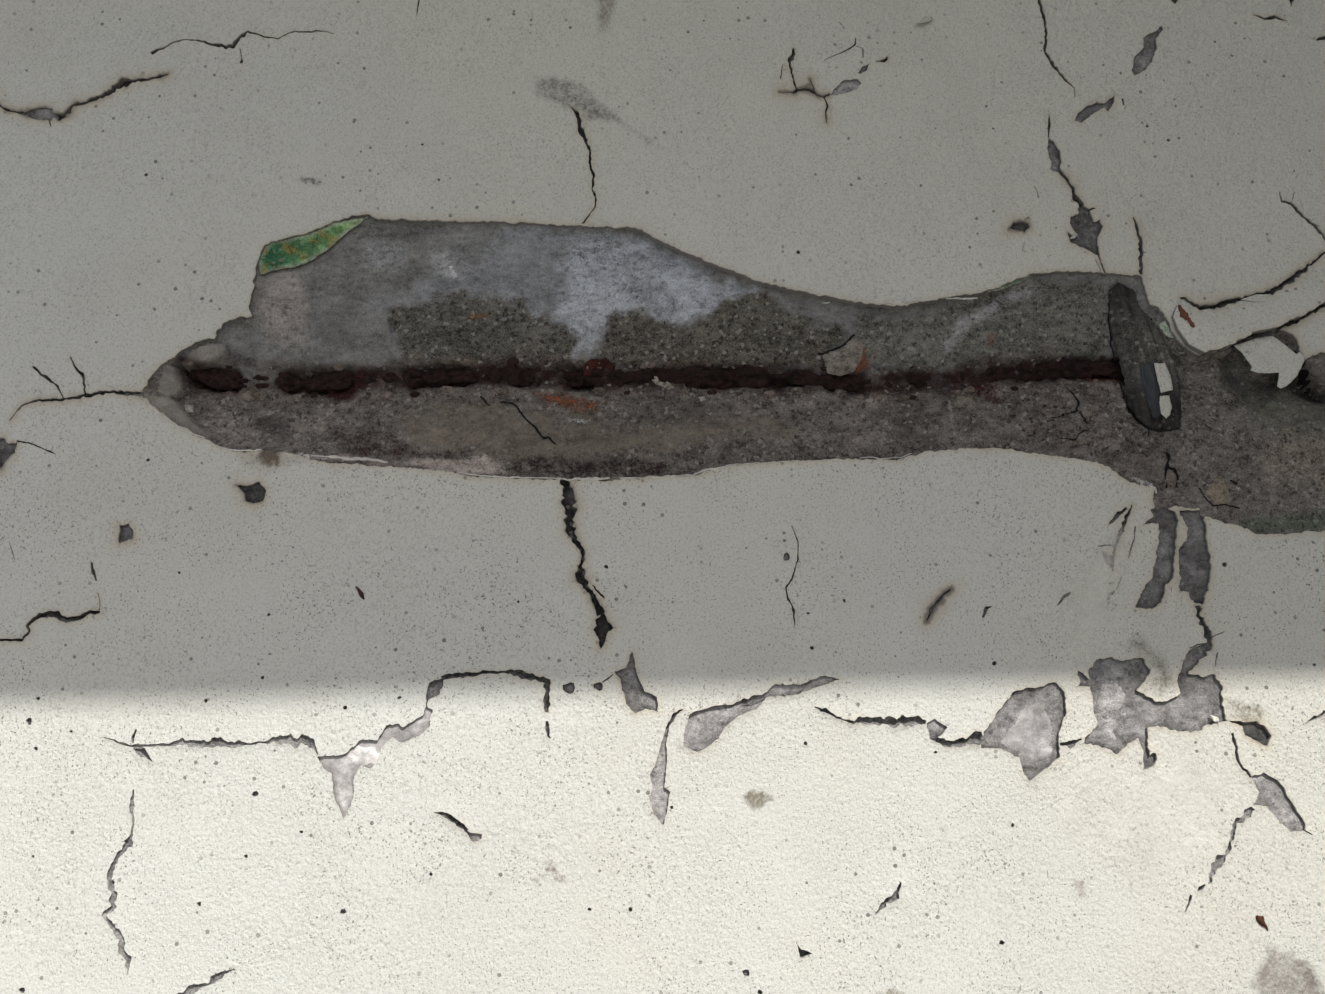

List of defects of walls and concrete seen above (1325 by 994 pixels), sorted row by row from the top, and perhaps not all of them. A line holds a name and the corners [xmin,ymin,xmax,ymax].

crack [1038,2,1057,71]
crack [0,81,133,121]
crack [780,51,860,119]
crack [574,112,596,222]
crack [35,368,145,402]
crack [560,480,613,648]
spalling [139,216,1325,890]
crack [0,611,100,642]
crack [105,734,318,760]
crack [103,795,135,970]
crack [178,969,235,994]
damp [1259,955,1320,994]